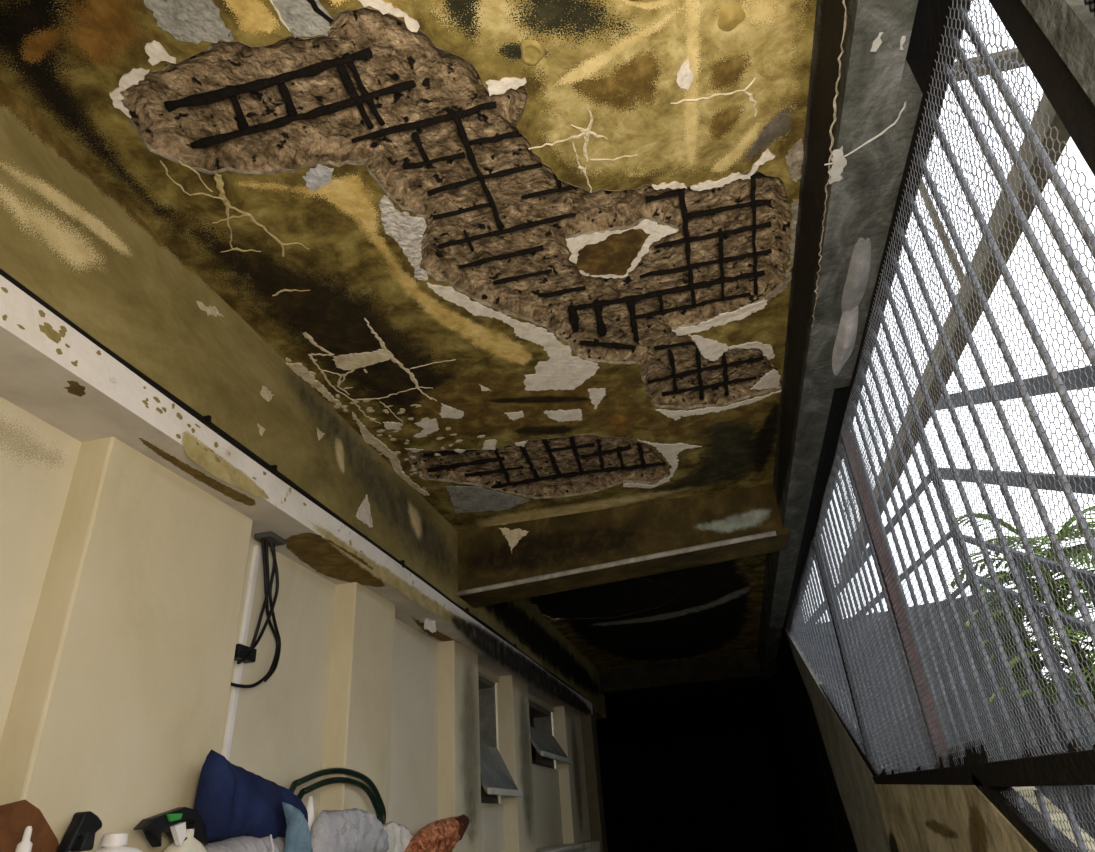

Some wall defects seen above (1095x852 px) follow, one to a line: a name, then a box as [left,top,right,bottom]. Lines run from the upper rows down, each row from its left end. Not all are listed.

crack [528,104,638,193]
crack [160,160,309,257]
spalling [109,0,804,422]
peeling [38,310,78,367]
peeling [64,381,86,397]
peeling [142,386,221,463]
crack [302,318,456,424]
water stain [0,0,855,581]
spalling [286,357,702,513]
peeling [356,495,373,528]
water stain [285,520,754,851]
water stain [923,800,1004,852]